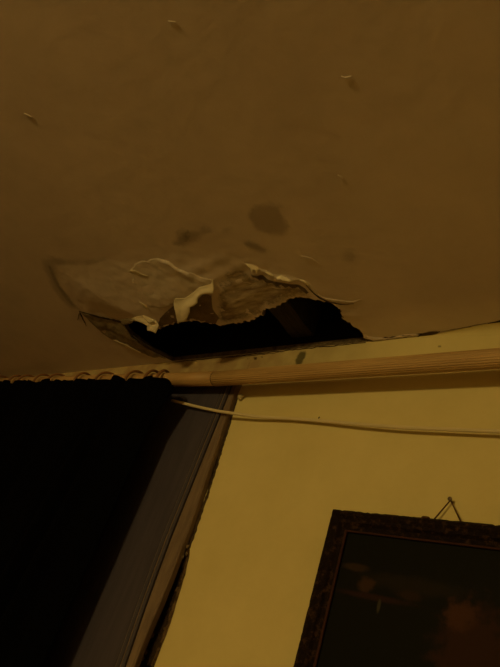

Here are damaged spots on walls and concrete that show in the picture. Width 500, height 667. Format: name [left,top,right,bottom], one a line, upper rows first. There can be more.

peeling [128,258,218,333]
peeling [243,262,360,305]